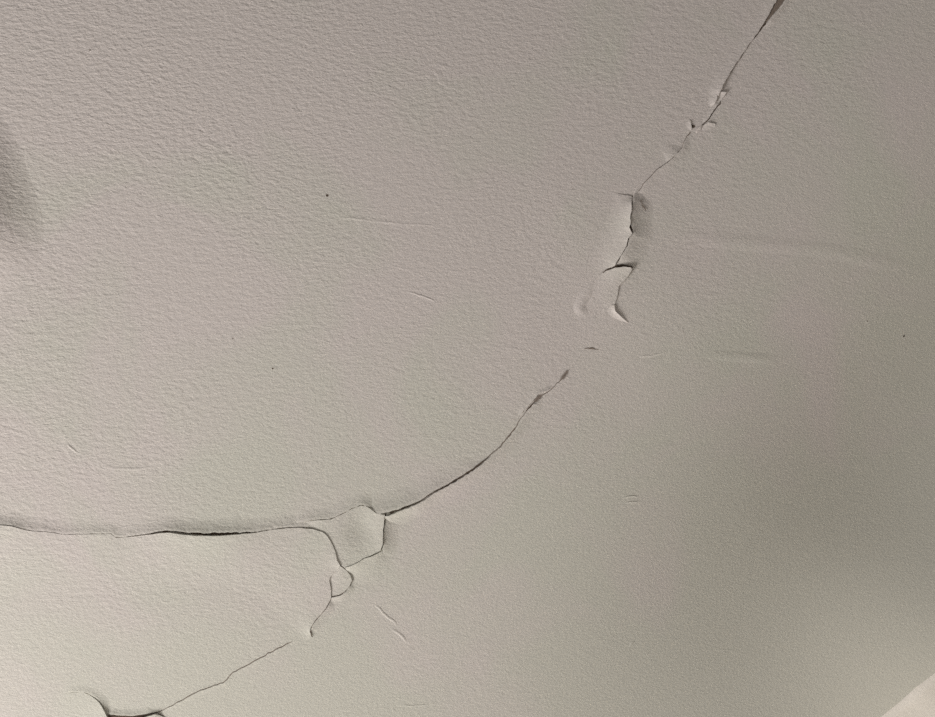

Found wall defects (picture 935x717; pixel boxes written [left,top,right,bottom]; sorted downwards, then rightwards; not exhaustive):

crack [632,0,794,197]
flaking render [573,186,653,323]
crack [372,347,599,525]
crack [158,642,292,713]